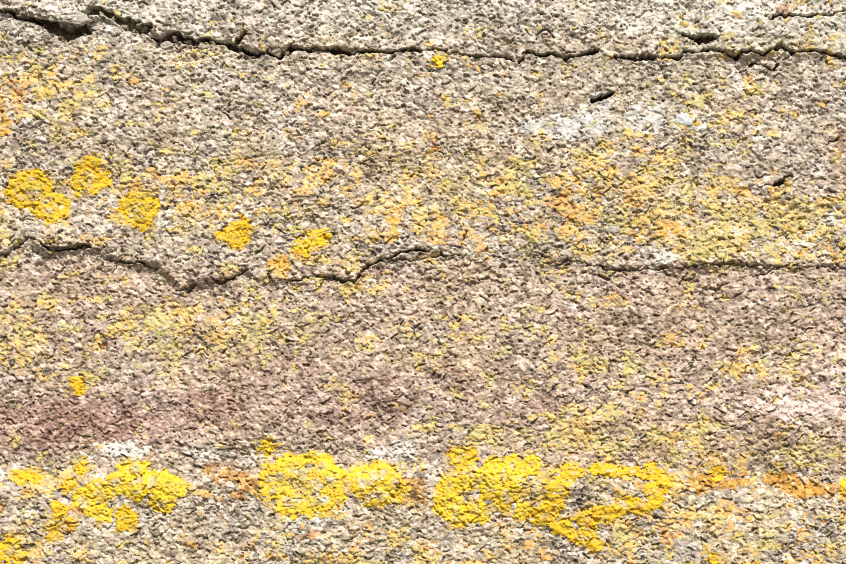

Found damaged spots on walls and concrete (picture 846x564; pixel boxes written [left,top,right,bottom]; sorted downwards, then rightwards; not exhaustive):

crack [0,7,124,34]
crack [772,10,846,20]
crack [148,29,846,71]
crack [0,237,91,259]
crack [177,249,263,293]
crack [293,249,445,284]
crack [532,254,845,299]